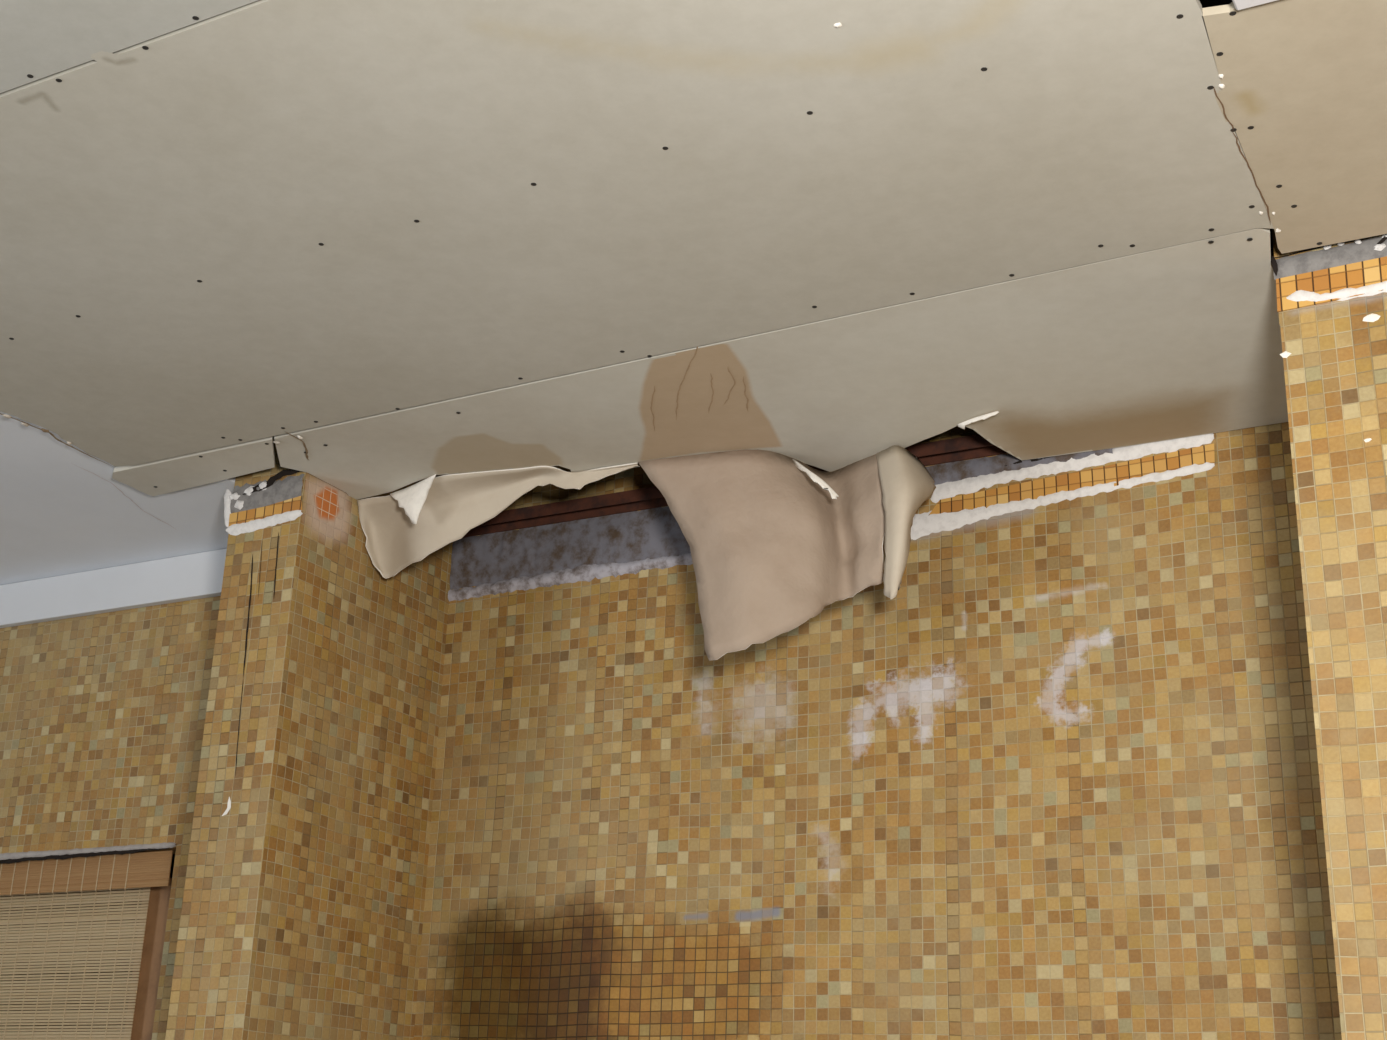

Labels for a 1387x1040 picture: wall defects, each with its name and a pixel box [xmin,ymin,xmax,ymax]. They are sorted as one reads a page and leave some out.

spalling [0,413,109,465]
peeling [422,430,572,476]
peeling [630,342,792,463]
leakage [1030,575,1114,608]
leakage [681,645,820,773]
leakage [839,608,983,772]
leakage [1027,622,1122,740]
leakage [413,807,858,1040]